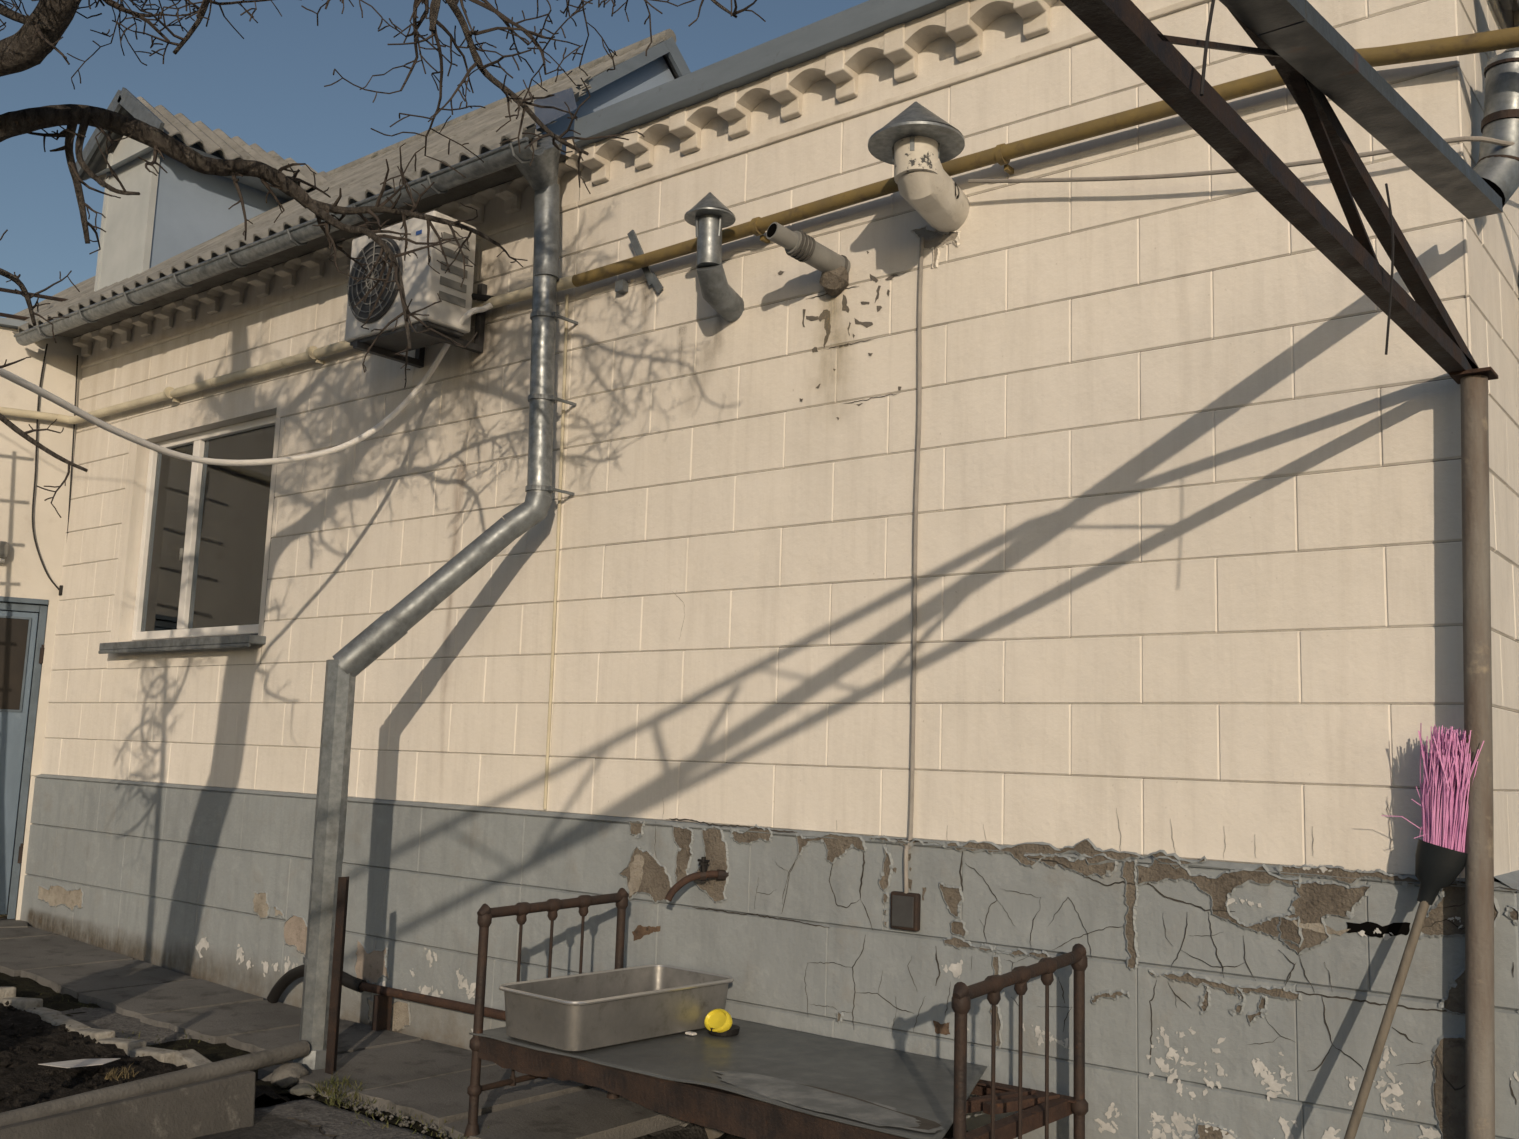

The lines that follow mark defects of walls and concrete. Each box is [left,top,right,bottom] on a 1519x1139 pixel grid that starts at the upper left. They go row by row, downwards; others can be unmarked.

peeling [195,937,209,958]
peeling [236,891,308,977]
peeling [354,939,476,1032]
crack [655,803,1466,1104]
flaking render [796,833,1420,955]
flaking render [1419,878,1465,939]
flaking render [1438,961,1465,1016]
crack [1422,887,1519,930]
peeling [1094,1102,1122,1133]
peeling [1146,982,1268,1139]
peeling [1251,1052,1293,1101]
flaking render [1346,1034,1466,1139]